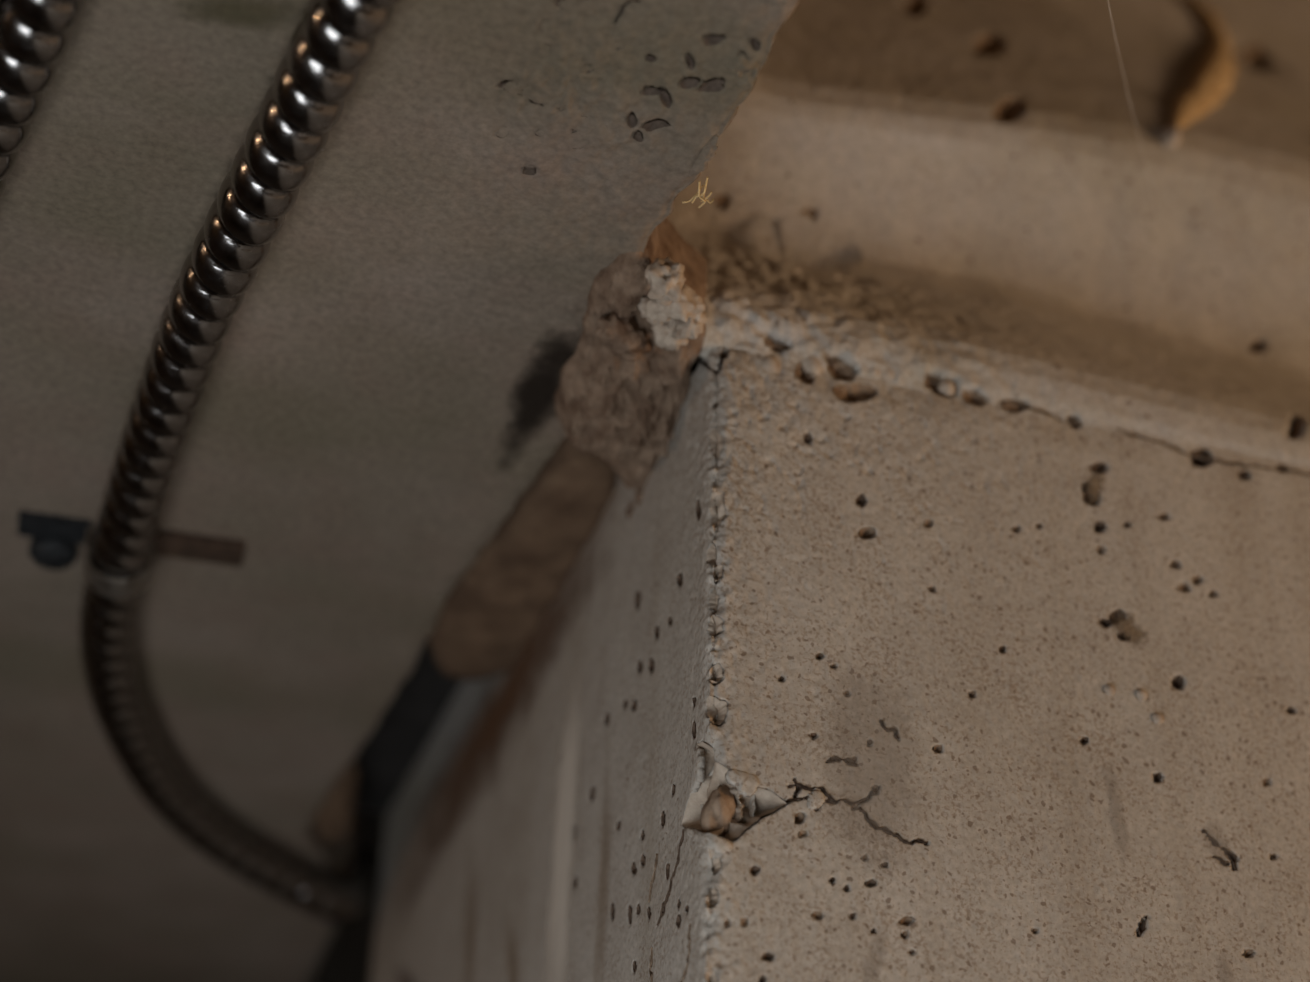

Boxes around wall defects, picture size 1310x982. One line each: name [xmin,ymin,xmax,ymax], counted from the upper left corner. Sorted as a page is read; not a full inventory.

crack [696,338,1310,476]
crack [786,756,928,845]
crack [648,829,691,982]